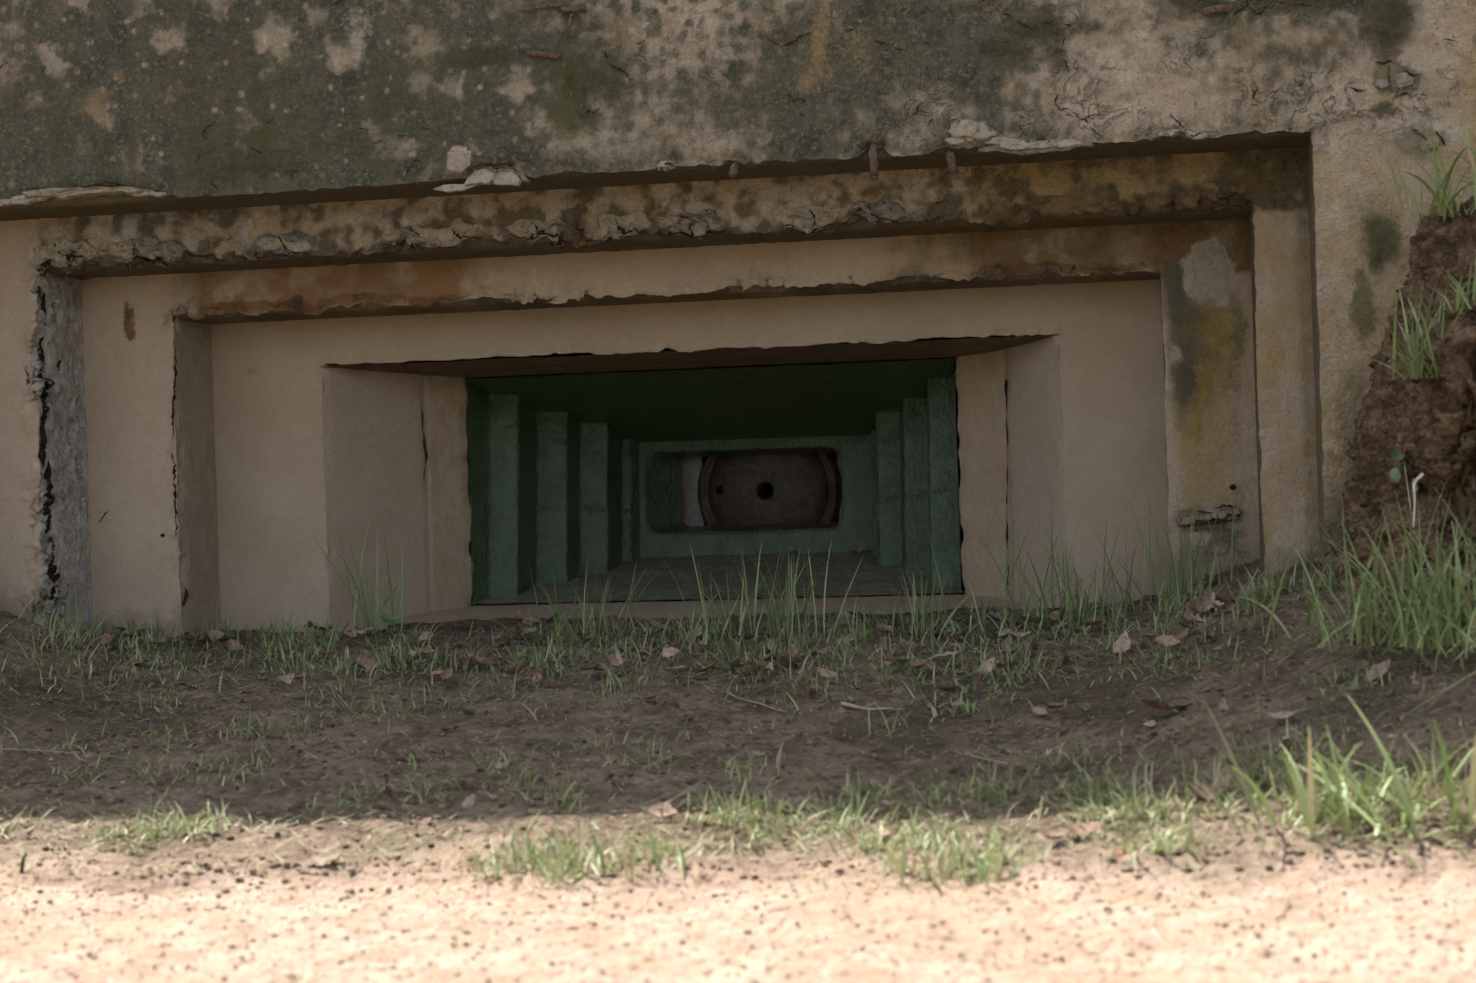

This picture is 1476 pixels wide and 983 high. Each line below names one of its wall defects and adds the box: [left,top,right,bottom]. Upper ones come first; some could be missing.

crack [1233,0,1313,15]
spalling [433,164,530,193]
spalling [656,160,677,172]
rust [869,143,879,180]
spalling [383,209,730,249]
spalling [785,199,909,236]
spalling [36,336,61,604]